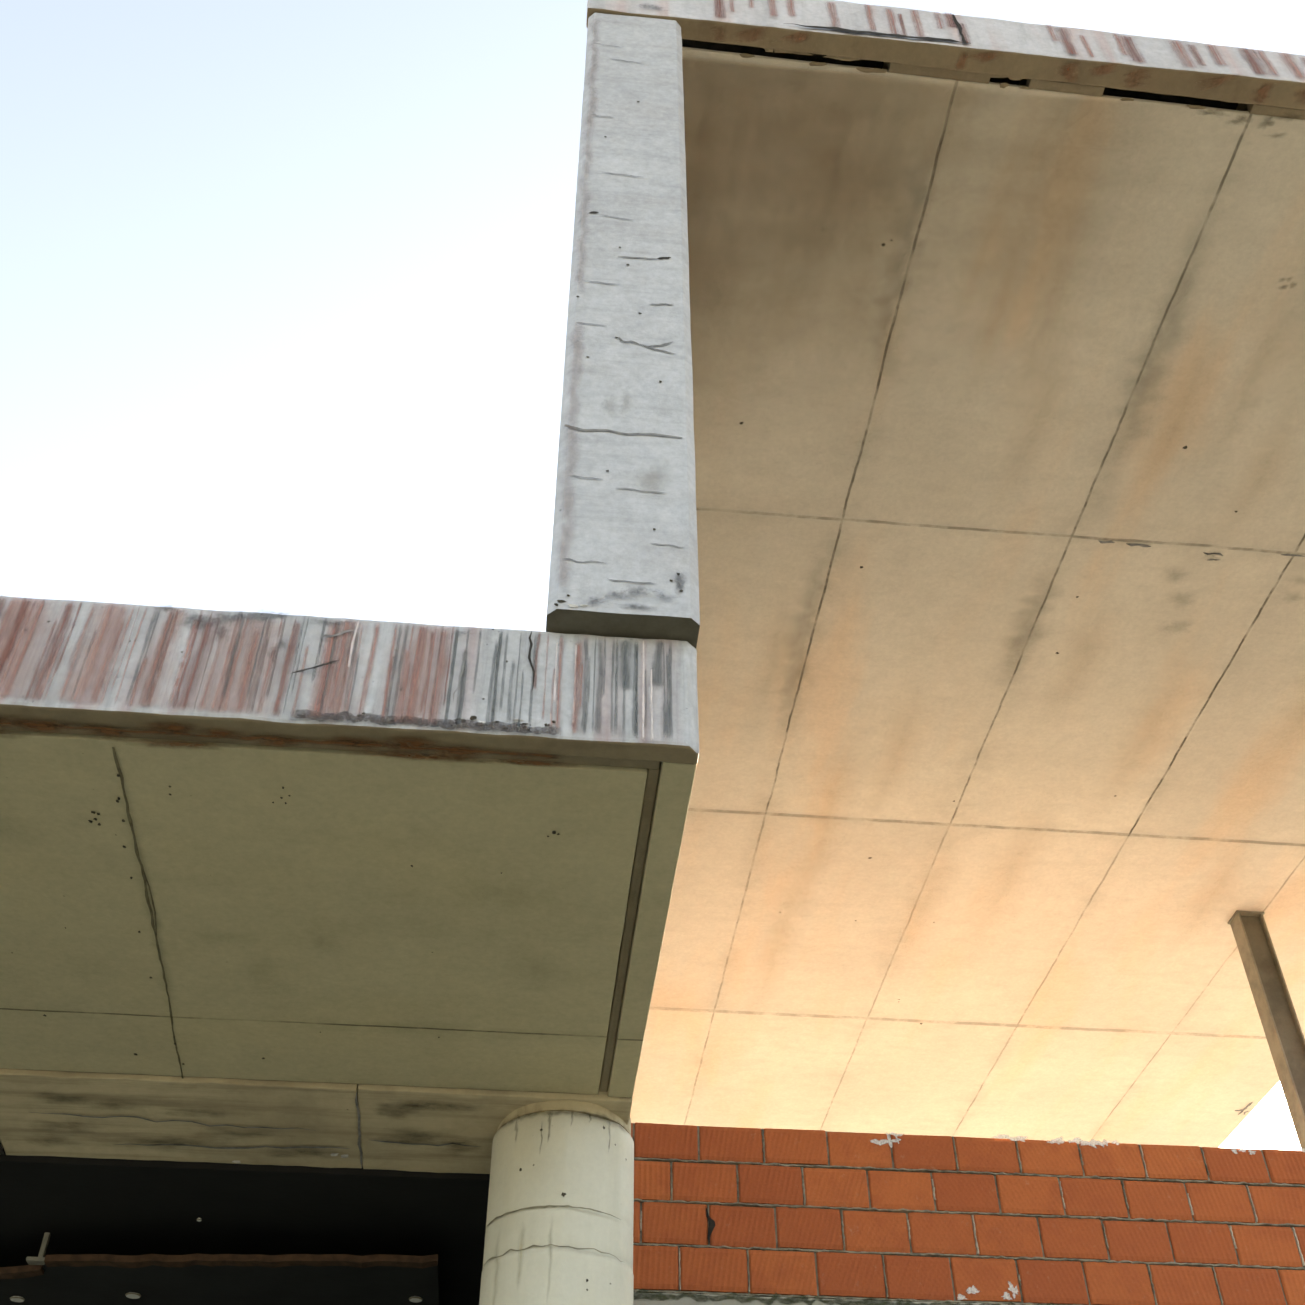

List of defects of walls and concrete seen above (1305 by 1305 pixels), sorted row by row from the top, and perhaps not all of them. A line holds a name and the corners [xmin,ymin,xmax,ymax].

crack [783,14,971,44]
rust [867,5,923,37]
rust [1047,25,1112,78]
crack [565,424,682,438]
rust [26,604,178,705]
rust [170,615,379,714]
rust [382,629,453,719]
crack [527,632,535,690]
rust [0,719,561,766]
crack [112,747,185,1079]
crack [31,1092,481,1168]
crack [483,1205,623,1266]